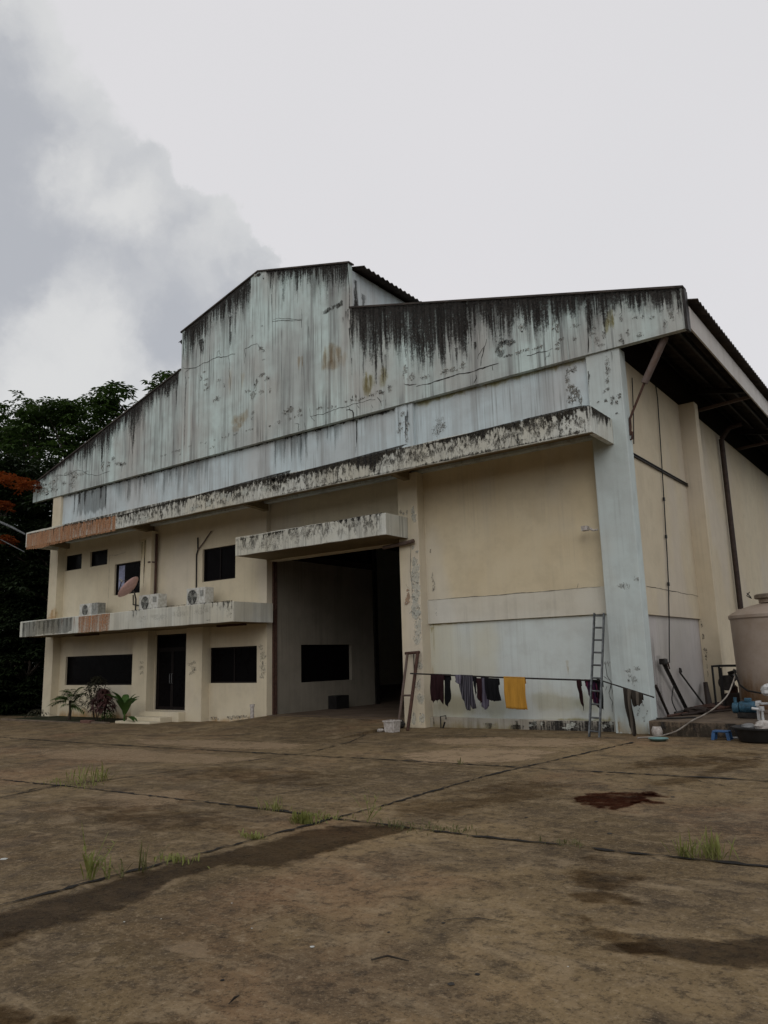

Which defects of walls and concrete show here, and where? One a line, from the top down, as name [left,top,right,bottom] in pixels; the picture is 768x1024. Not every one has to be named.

leakage [183,278,251,354]
leakage [266,263,682,372]
crack [405,339,498,387]
leakage [38,372,179,482]
leakage [29,403,611,534]
rust [26,516,116,550]
rust [78,613,110,633]